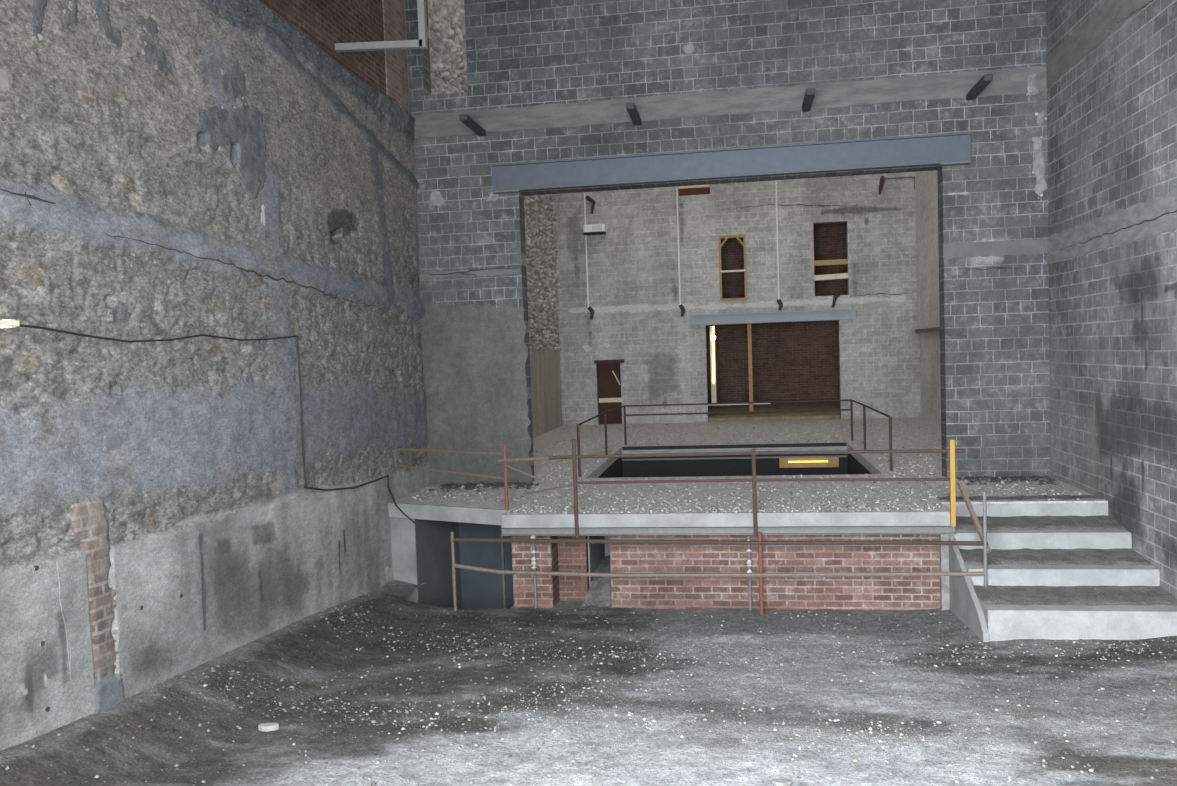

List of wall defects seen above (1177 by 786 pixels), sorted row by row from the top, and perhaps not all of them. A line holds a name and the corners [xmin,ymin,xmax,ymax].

crack [1060,210,1177,250]
spalling [70,496,125,713]